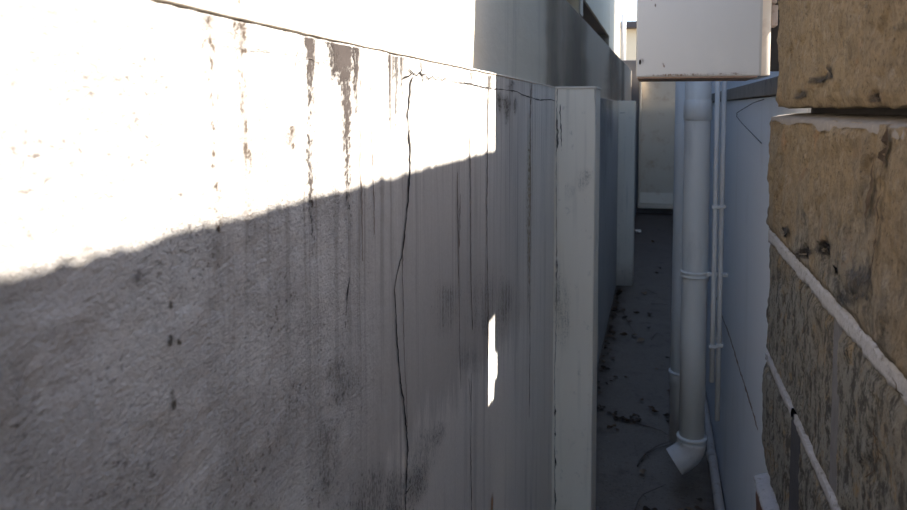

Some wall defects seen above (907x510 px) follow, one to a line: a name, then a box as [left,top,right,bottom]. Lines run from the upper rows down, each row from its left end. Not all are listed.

damp [234,21,252,173]
damp [305,37,360,239]
damp [388,54,405,120]
crack [394,61,562,510]